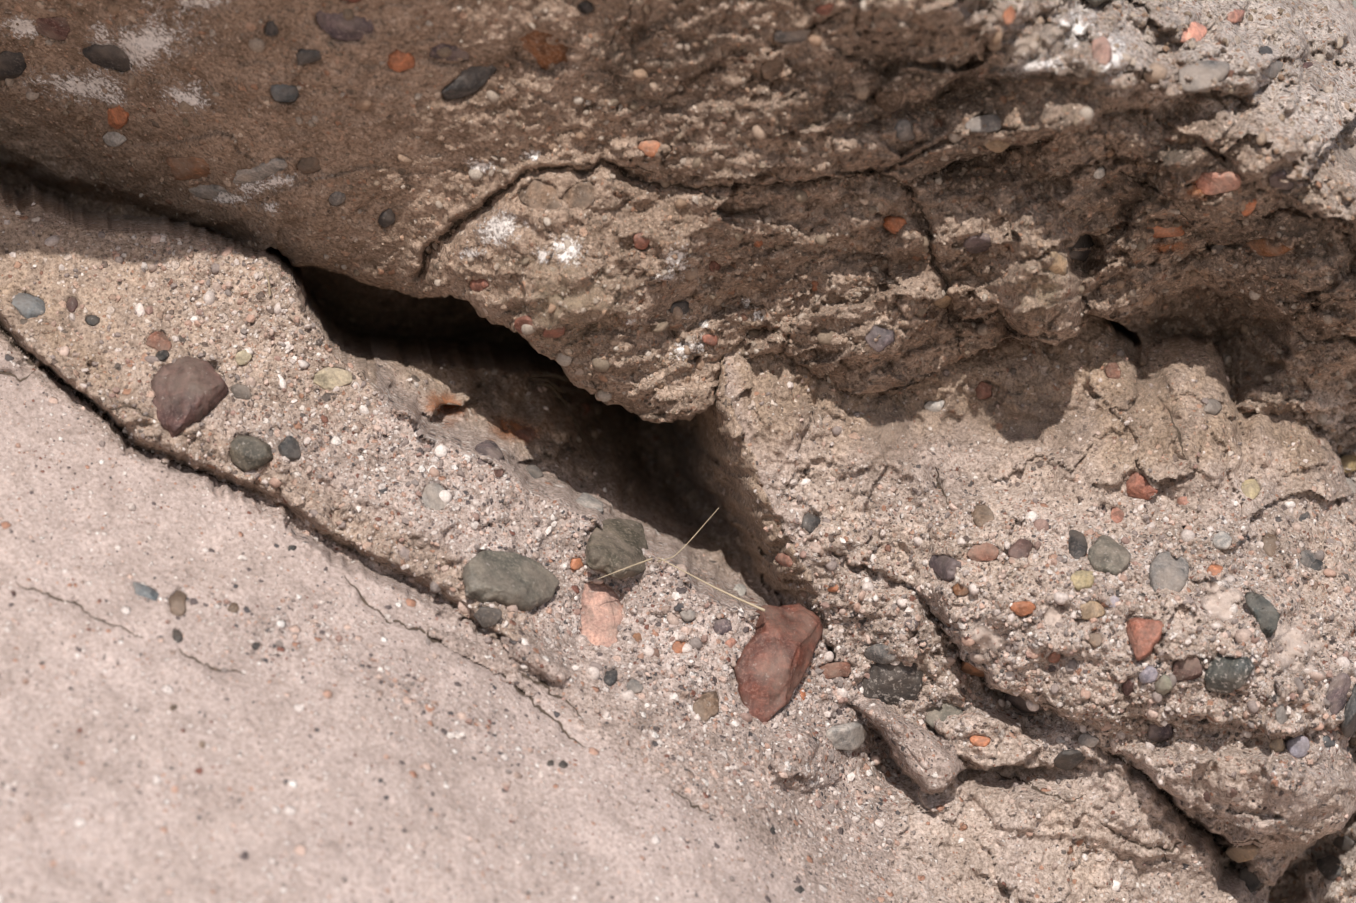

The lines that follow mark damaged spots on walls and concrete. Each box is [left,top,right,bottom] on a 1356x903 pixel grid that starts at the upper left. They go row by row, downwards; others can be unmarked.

crack [607,0,637,46]
crack [810,0,879,29]
crack [418,136,1062,396]
crack [0,325,243,492]
crack [15,582,143,638]
crack [178,647,246,675]